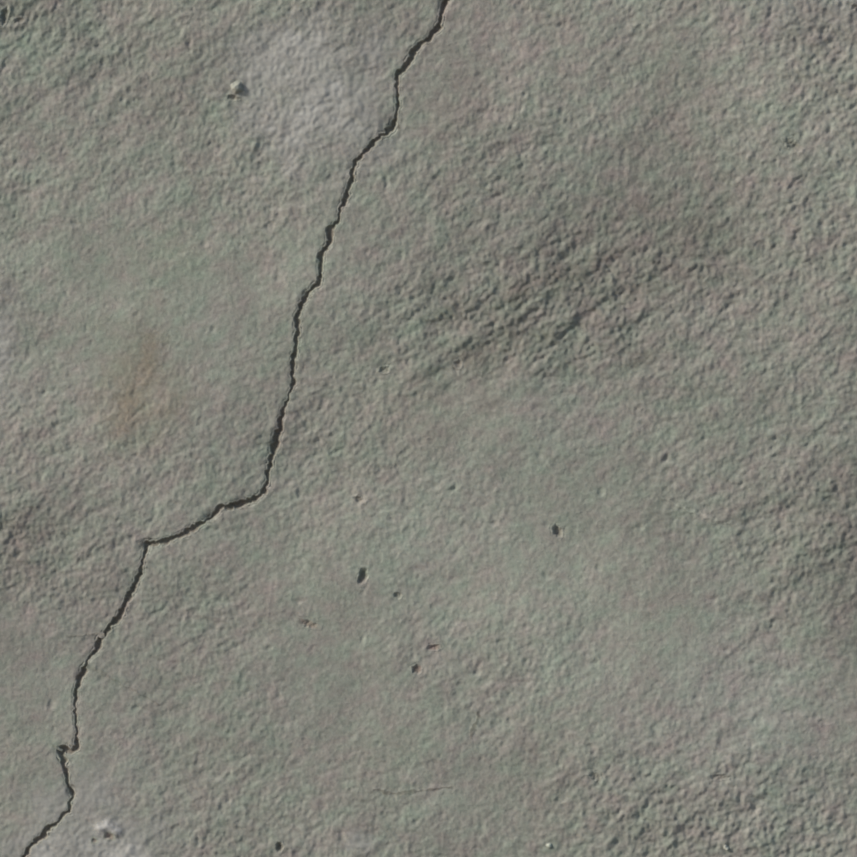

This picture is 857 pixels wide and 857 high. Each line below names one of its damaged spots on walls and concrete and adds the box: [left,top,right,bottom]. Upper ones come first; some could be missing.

crack [21,0,453,857]